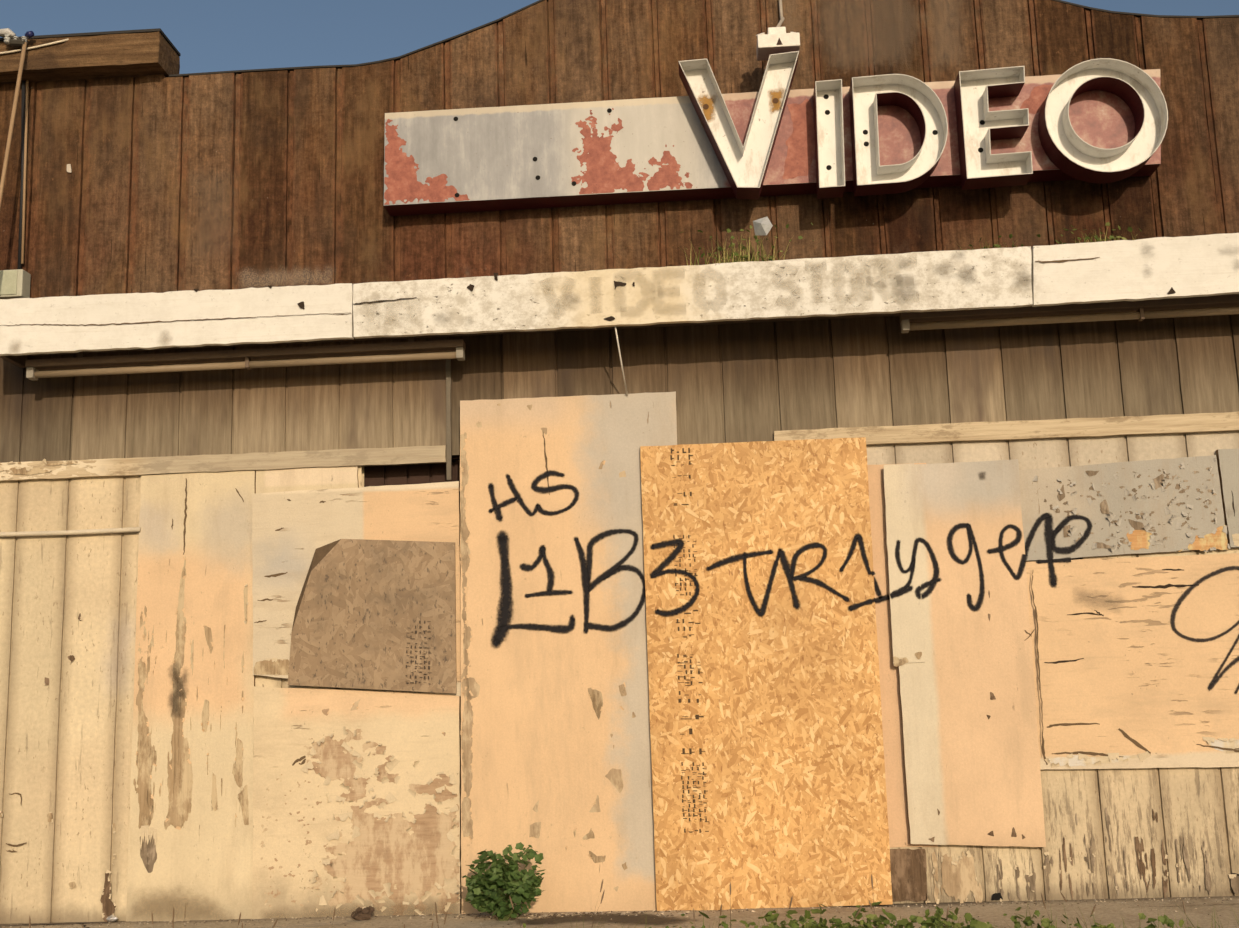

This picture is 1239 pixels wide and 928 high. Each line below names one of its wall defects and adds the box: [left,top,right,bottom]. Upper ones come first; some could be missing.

peeling [384,119,470,205]
peeling [571,108,697,194]
peeling [1032,458,1239,553]
damp [171,671,185,712]
peeling [133,422,482,916]
peeling [1044,751,1151,768]
peeling [1202,737,1239,753]
peeling [890,837,983,904]
peeling [997,807,1239,902]